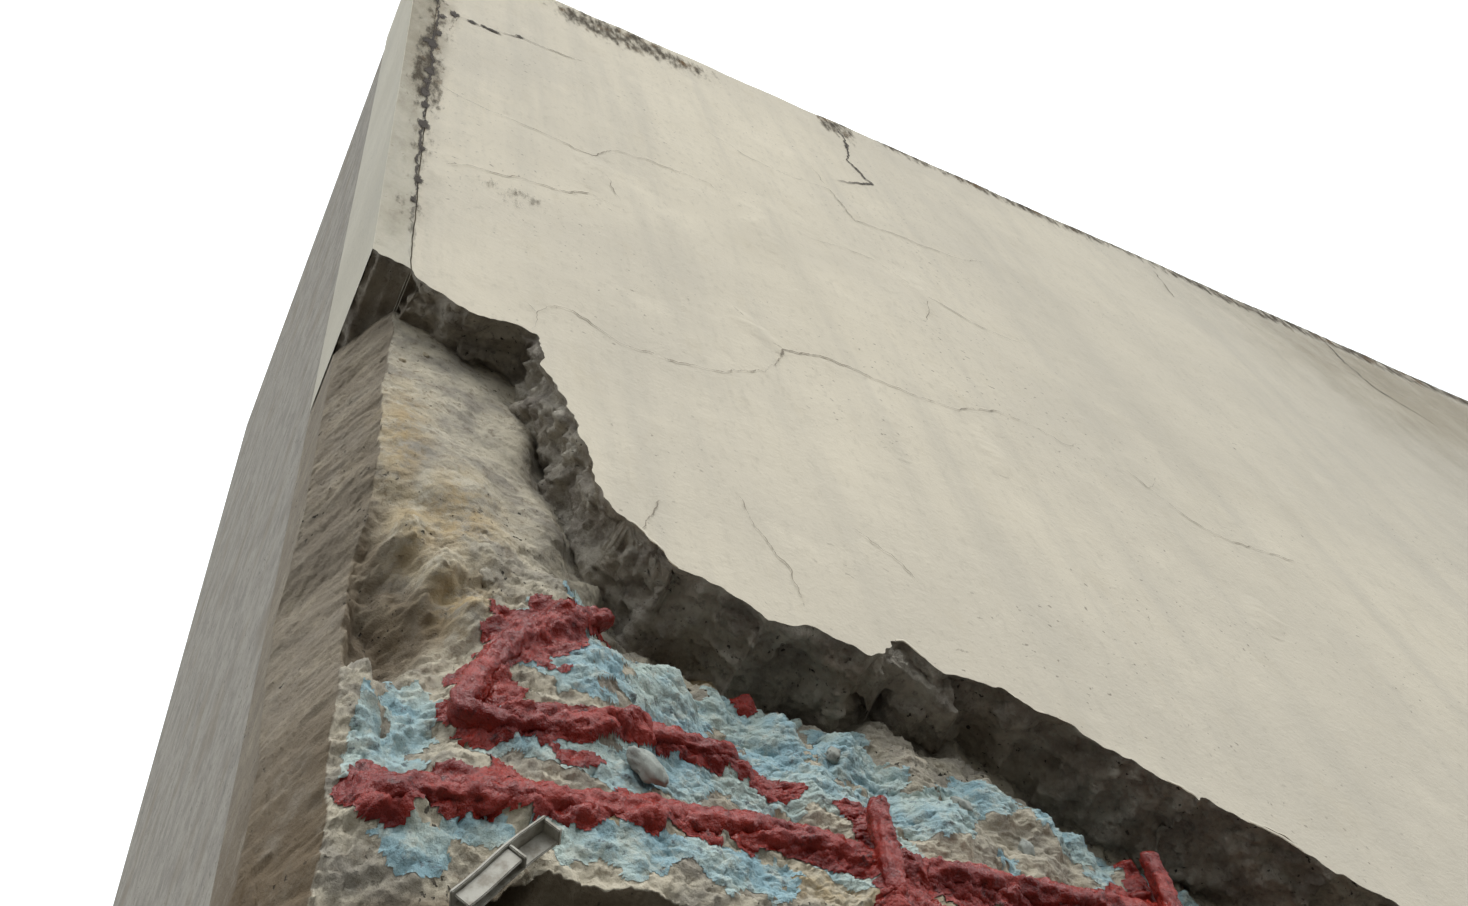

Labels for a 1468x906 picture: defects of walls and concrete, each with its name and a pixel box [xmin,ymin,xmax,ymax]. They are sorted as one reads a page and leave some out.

mould [413,0,444,108]
crack [410,0,706,207]
mould [559,7,700,73]
crack [739,124,971,266]
crack [537,306,997,411]
spalling [209,249,1399,906]